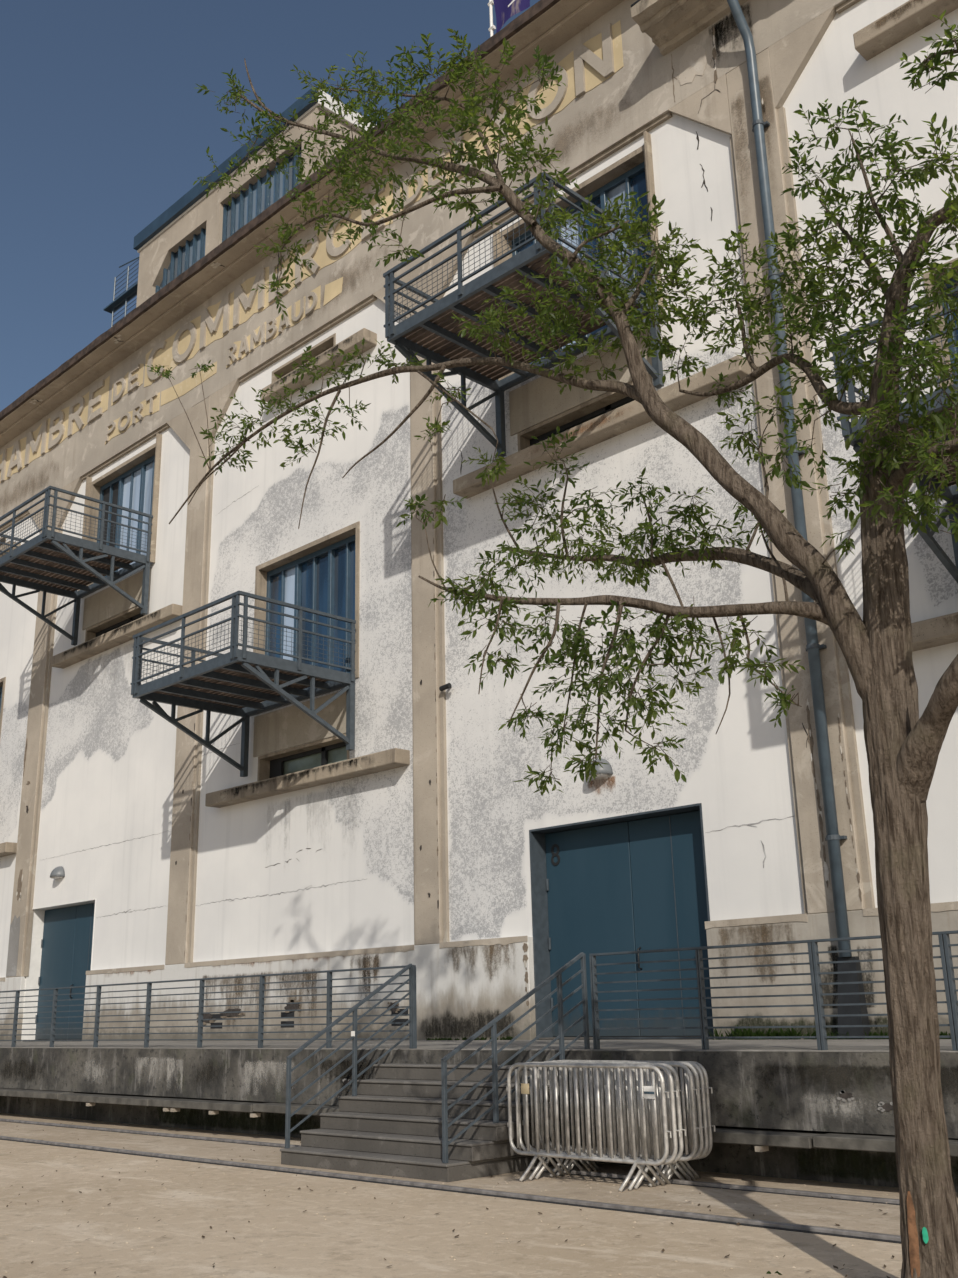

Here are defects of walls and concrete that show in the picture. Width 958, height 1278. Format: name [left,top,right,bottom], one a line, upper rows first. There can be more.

crack [671,33,720,221]
crack [705,816,794,868]
damp [358,956,379,992]
damp [451,945,509,977]
damp [719,924,774,981]
mould [422,1011,513,1037]